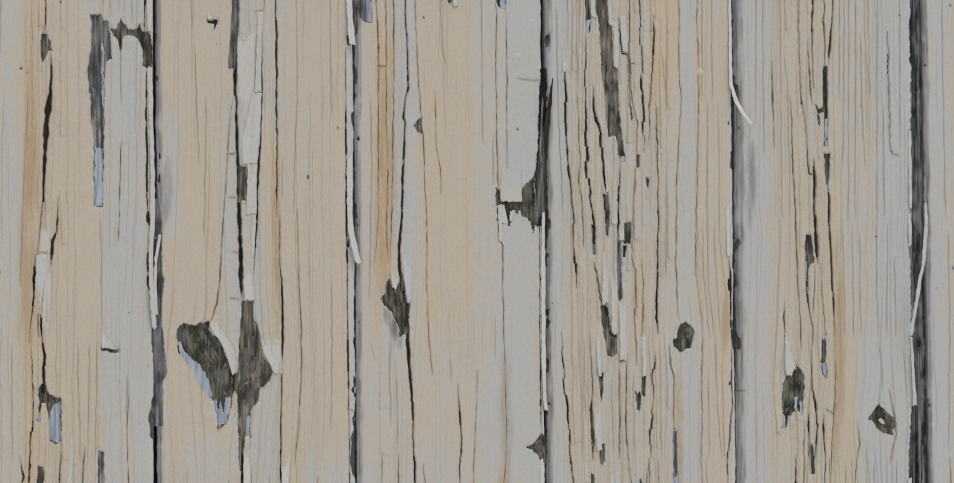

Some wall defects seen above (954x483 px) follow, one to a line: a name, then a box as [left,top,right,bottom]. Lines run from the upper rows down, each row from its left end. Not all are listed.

peeling [33,466,44,483]
crack [21,65,58,483]
peeling [38,384,74,483]
peeling [87,0,167,426]
peeling [210,319,237,375]
crack [213,0,302,483]
crack [343,111,351,410]
peeling [391,252,412,303]
crack [377,0,441,483]
crack [459,406,477,477]
peeling [495,67,548,411]
peeling [585,0,641,483]